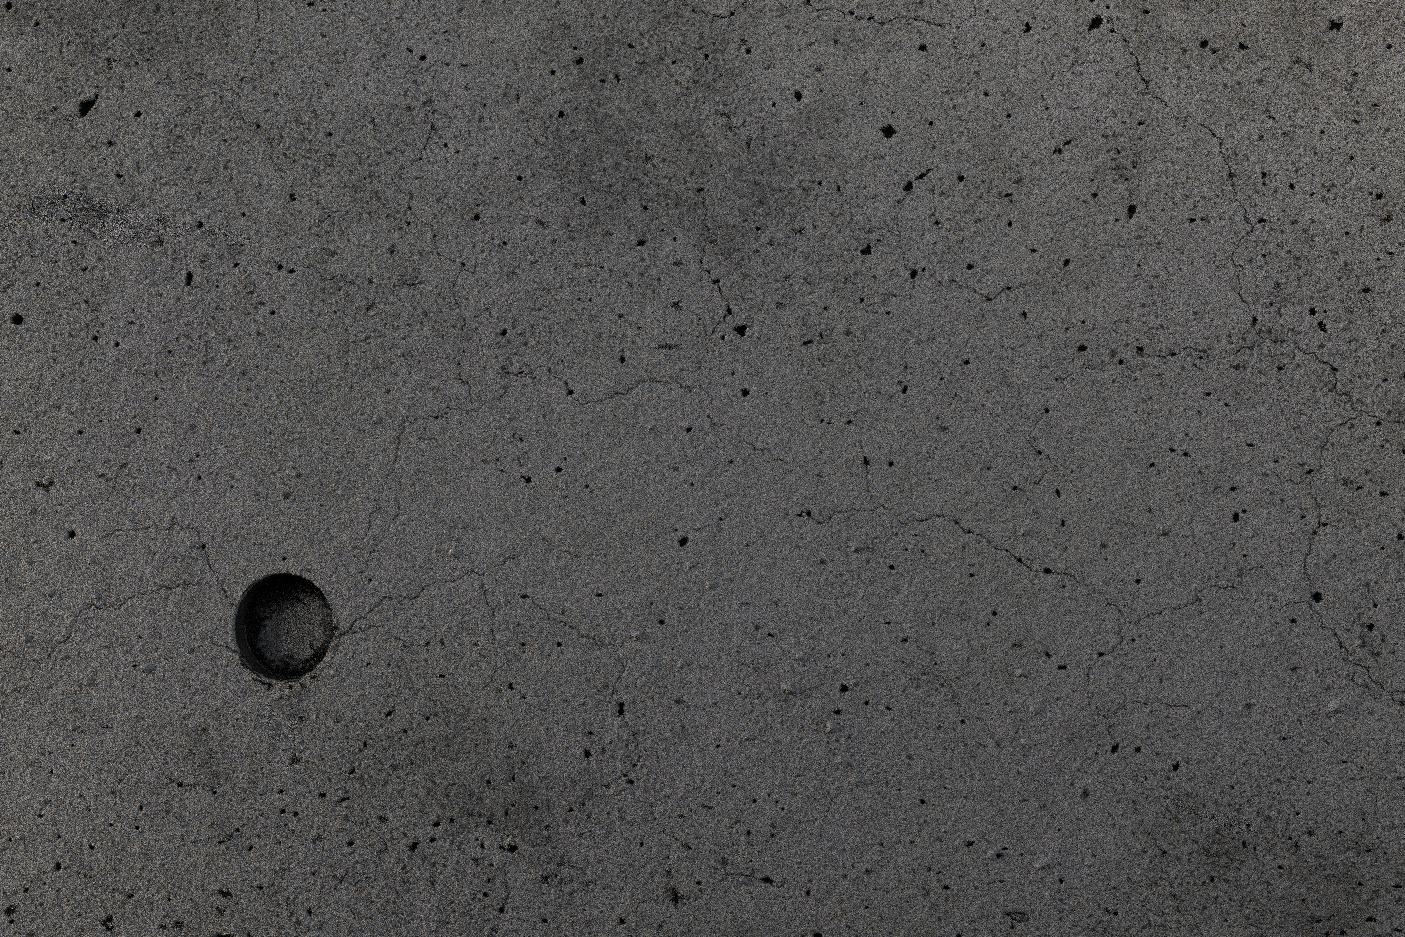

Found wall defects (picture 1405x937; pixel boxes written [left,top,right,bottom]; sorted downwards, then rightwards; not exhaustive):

crack [162,0,311,173]
crack [666,0,765,24]
crack [797,0,976,33]
crack [0,239,98,317]
crack [848,193,1040,339]
crack [335,89,788,688]
crack [1062,16,1405,705]
crack [0,522,236,664]
crack [800,369,1262,773]
crack [532,601,640,765]
crack [721,874,787,888]
crack [1142,821,1199,932]